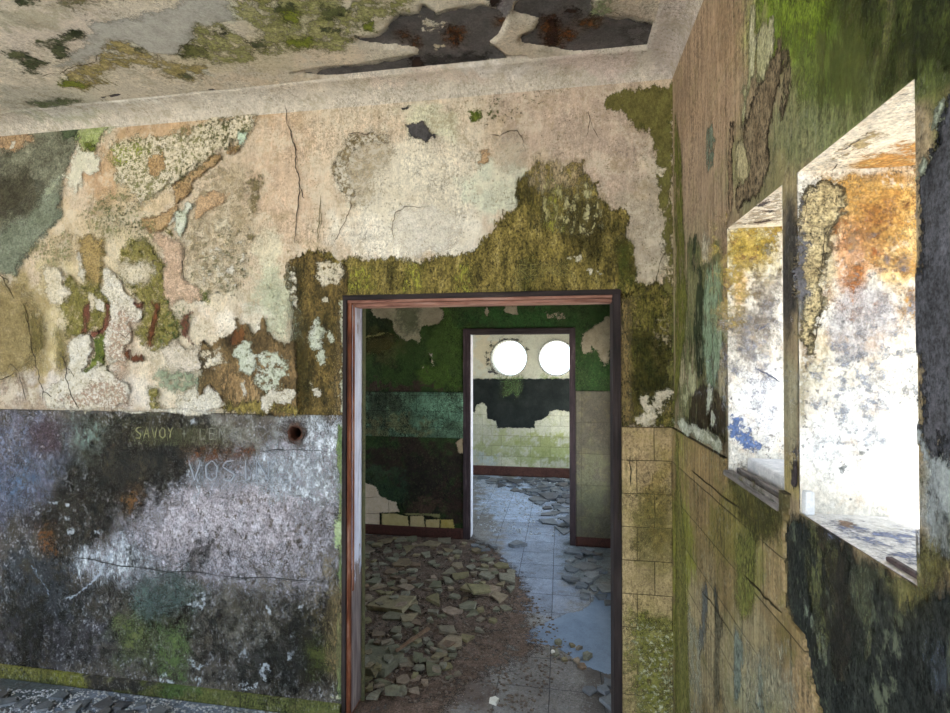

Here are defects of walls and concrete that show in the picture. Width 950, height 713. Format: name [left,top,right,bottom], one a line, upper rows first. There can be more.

spalling [305,0,652,75]
crack [285,108,322,242]
flaking render [789,176,849,358]
corrosion [821,165,917,339]
peeling [40,267,300,418]
peeling [473,338,569,429]
corrosion [831,342,880,425]
damp [0,312,343,698]
crack [74,557,320,582]
damp [688,583,723,713]
damp [728,477,798,713]
crack [745,576,782,613]